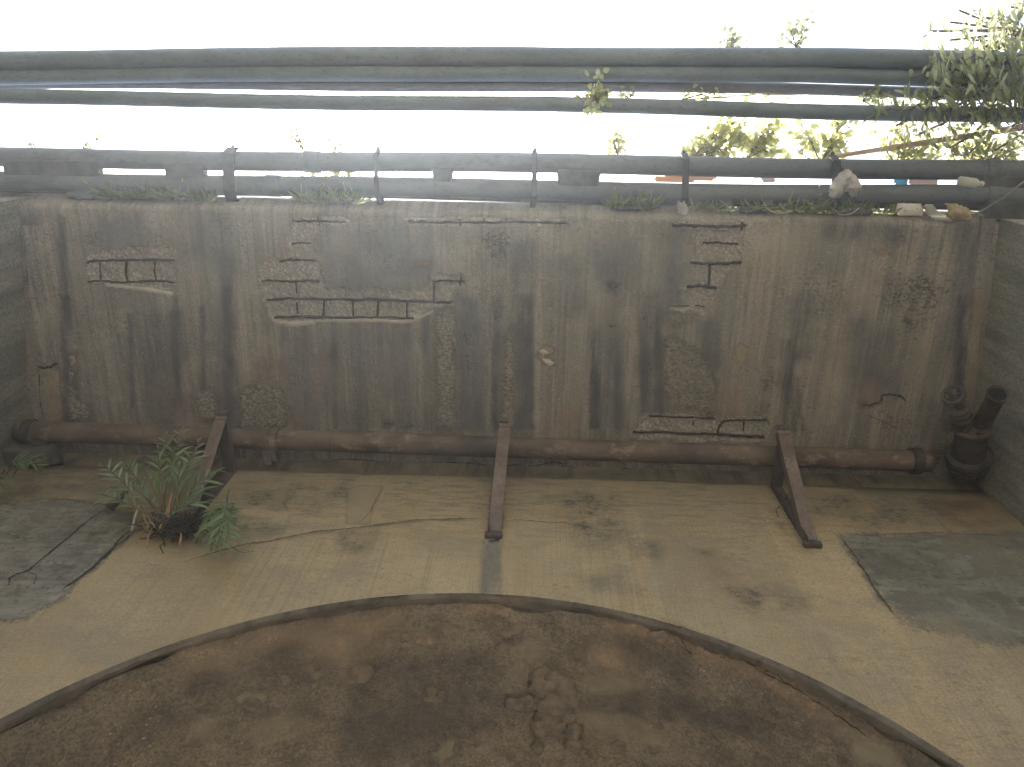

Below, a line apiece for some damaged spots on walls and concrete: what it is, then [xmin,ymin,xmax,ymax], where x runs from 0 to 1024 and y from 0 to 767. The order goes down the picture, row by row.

spalling [86,244,177,296]
spalling [257,216,468,327]
spalling [670,219,754,315]
spalling [630,411,772,442]
crack [8,498,134,589]
crack [185,491,476,562]